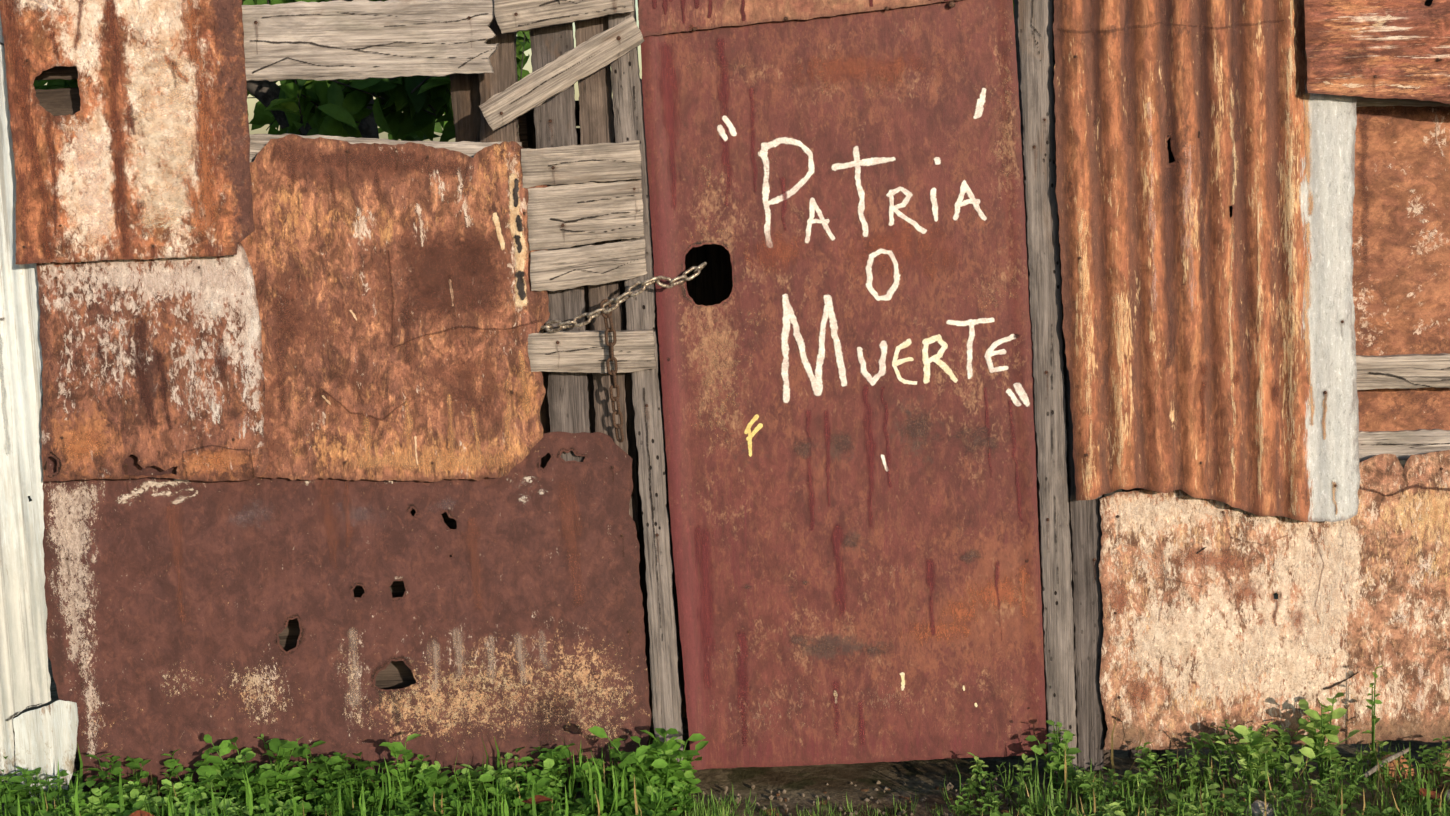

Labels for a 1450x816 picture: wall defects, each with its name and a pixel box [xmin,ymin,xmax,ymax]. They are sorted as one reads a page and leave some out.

corrosion [6,0,58,259]
corrosion [50,0,83,60]
corrosion [105,0,142,257]
corrosion [134,317,172,429]
corrosion [165,0,217,234]
corrosion [215,345,227,375]
corrosion [402,238,497,363]
corrosion [1161,0,1177,367]
corrosion [1199,0,1209,300]
corrosion [1303,90,1327,440]
corrosion [227,657,290,724]
corrosion [339,642,417,737]